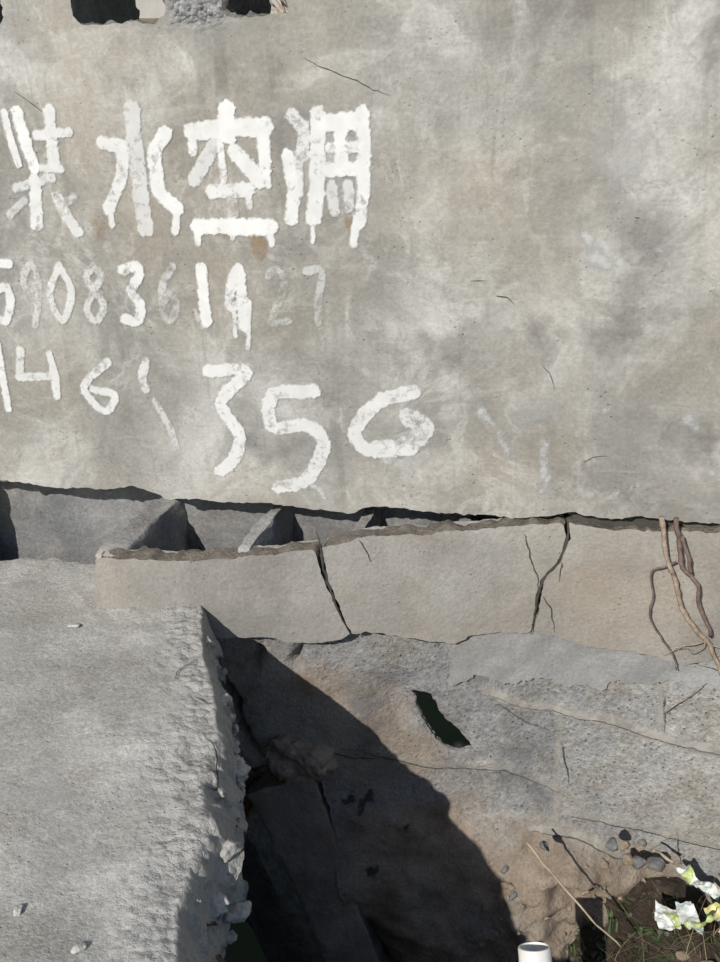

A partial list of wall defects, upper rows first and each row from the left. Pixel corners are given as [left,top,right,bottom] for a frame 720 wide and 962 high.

crack [316,531,351,635]
crack [524,512,717,635]